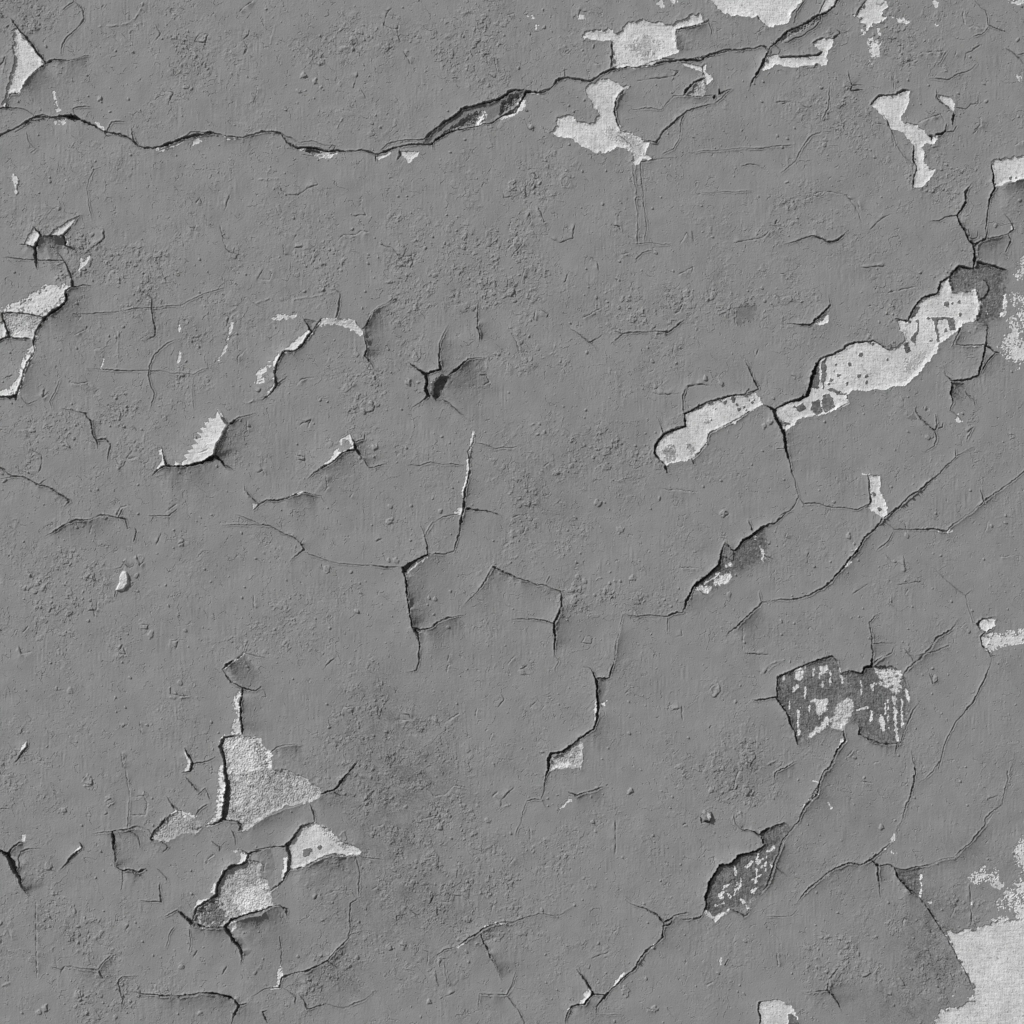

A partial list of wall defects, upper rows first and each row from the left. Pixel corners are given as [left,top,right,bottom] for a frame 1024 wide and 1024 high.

crack [0,0,839,163]
peeling [551,13,713,166]
peeling [711,0,803,27]
peeling [654,361,763,474]
peeling [775,262,1007,431]
crack [224,430,578,673]
crack [726,404,1024,637]
peeling [97,642,381,965]
crack [516,615,624,836]
peeling [754,613,920,755]
crack [597,897,702,1011]
peeling [934,835,1024,1024]